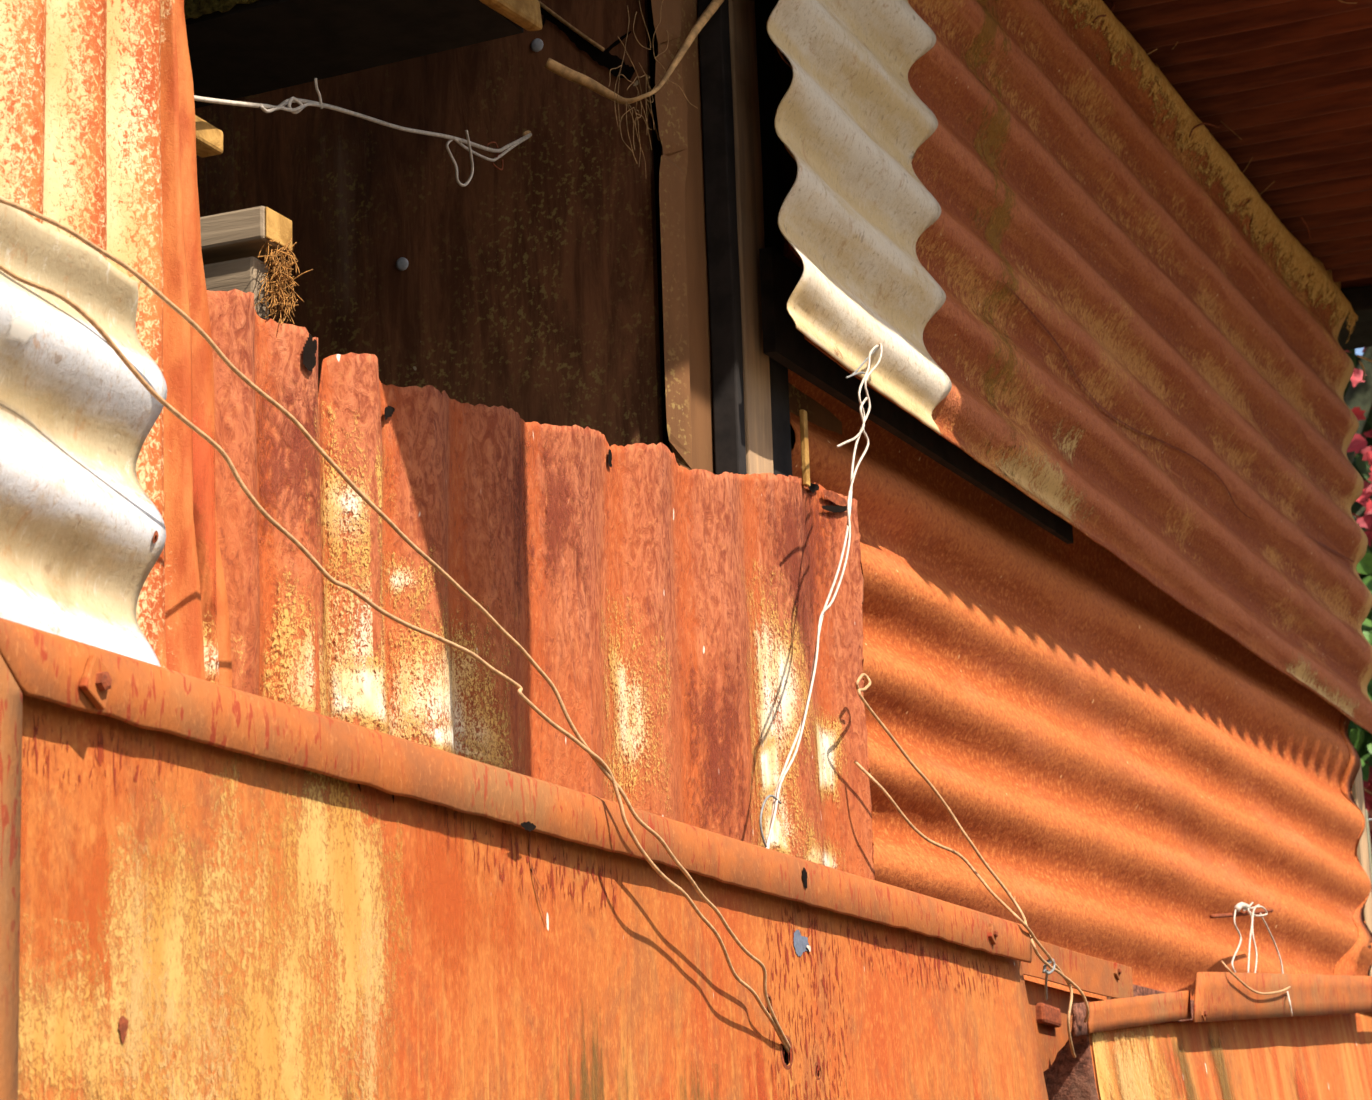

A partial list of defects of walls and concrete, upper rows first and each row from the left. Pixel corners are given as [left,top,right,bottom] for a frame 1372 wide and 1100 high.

corrosion [193,420,217,628]
corrosion [258,383,321,544]
corrosion [513,432,587,617]
corrosion [767,484,836,667]
corrosion [681,655,752,838]